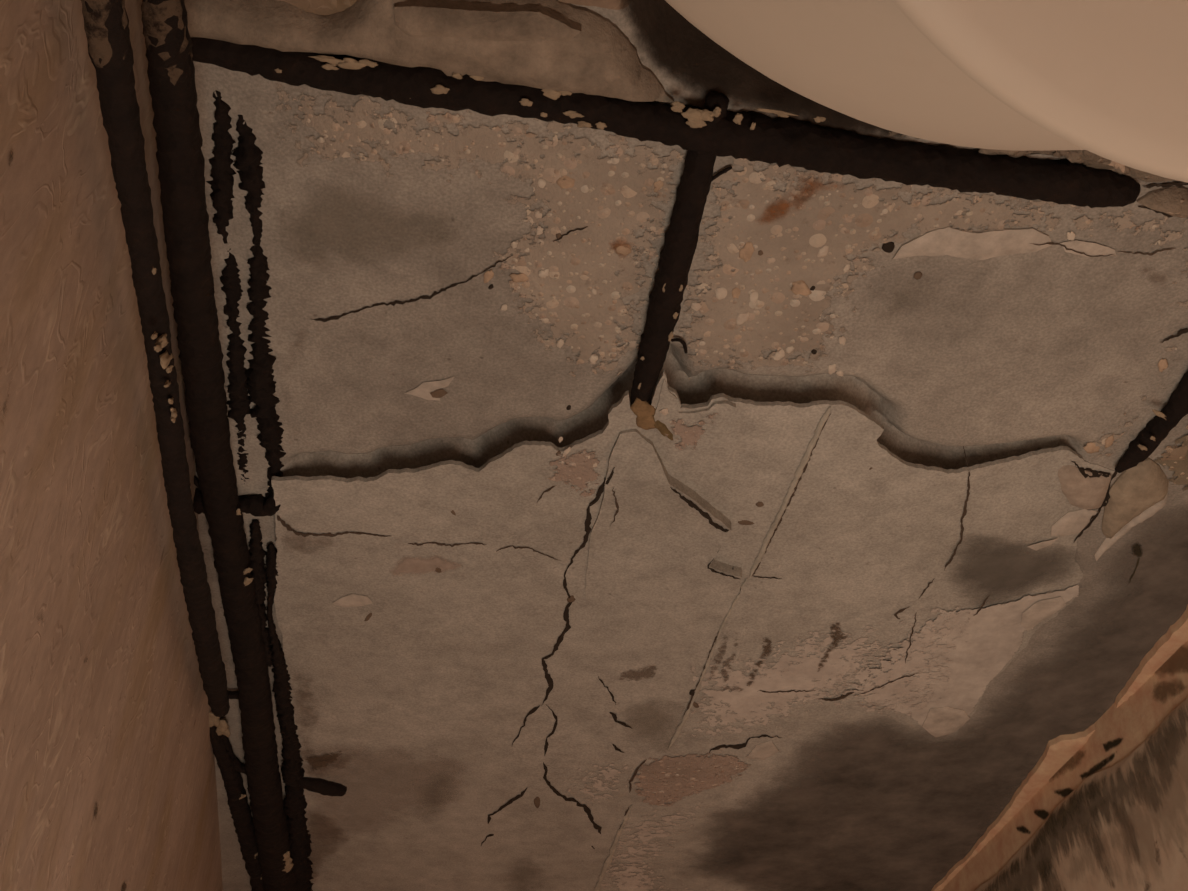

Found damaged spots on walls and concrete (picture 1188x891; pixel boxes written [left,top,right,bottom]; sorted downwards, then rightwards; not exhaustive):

peeling [184,0,919,139]
crack [312,255,513,322]
spalling [269,83,686,377]
rust [762,182,816,222]
spalling [673,157,1188,376]
spalling [978,148,1178,182]
crack [1071,461,1117,542]
spalling [1094,425,1188,561]
crack [277,467,619,849]
crack [598,676,633,753]
leakage [685,511,1188,891]
leakage [598,805,708,891]